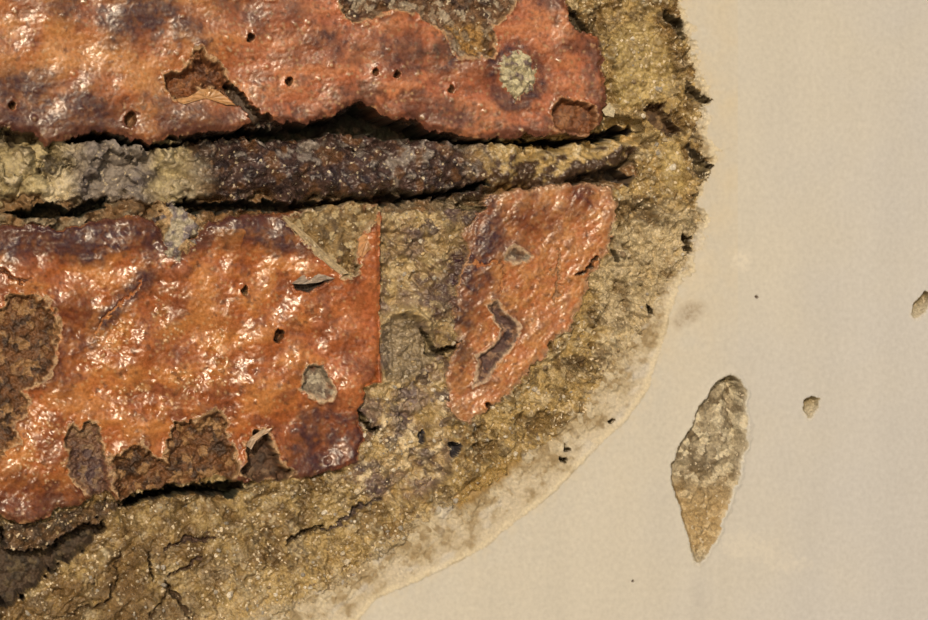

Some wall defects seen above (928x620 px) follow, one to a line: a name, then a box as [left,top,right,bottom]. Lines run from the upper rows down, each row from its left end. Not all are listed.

crack [64,84,645,152]
crack [3,196,110,221]
crack [175,180,491,217]
crack [564,166,636,187]
spalling [0,0,723,620]
spalling [910,290,928,321]
spalling [800,393,823,422]
spalling [669,372,752,567]
crack [285,496,384,548]
crack [0,480,246,620]